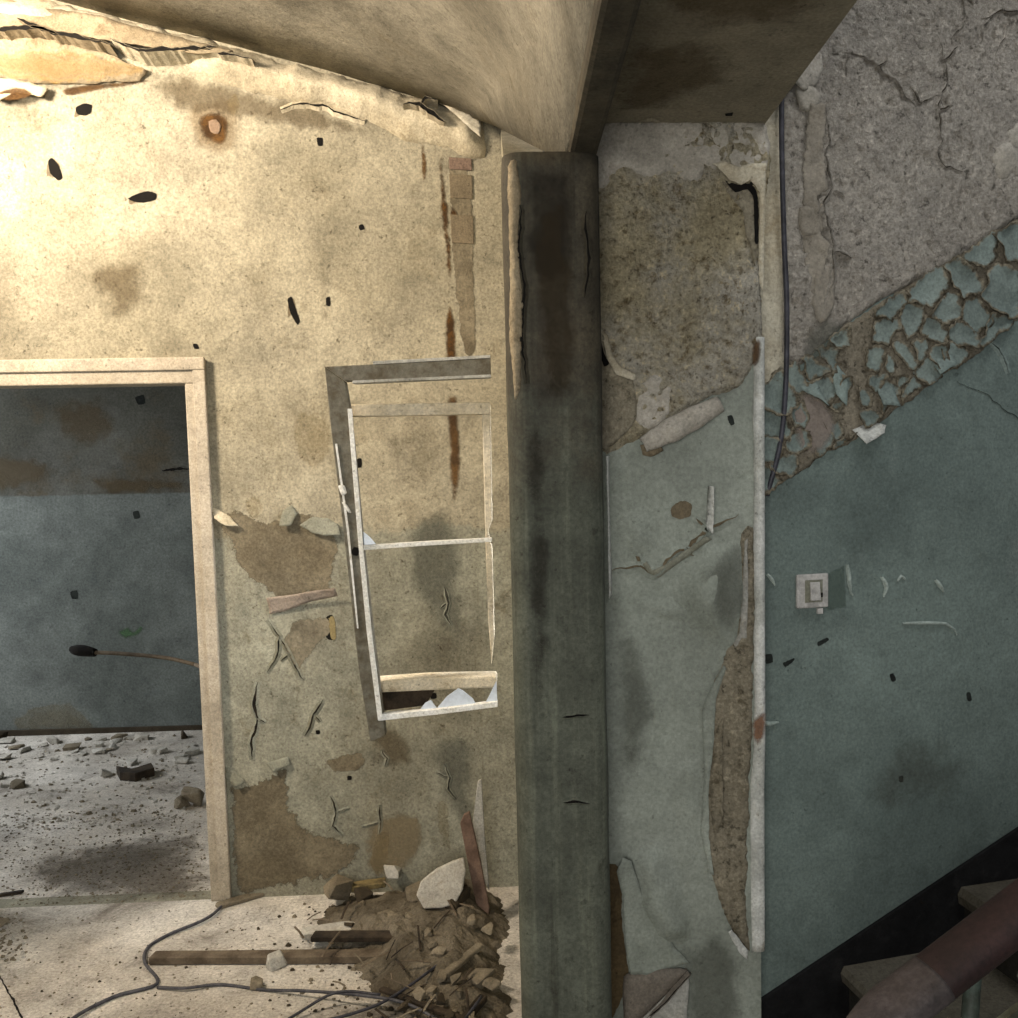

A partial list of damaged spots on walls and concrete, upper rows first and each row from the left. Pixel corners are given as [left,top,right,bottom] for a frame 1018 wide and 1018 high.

corrosion [200,114,227,143]
flaking render [0,0,486,356]
corrosion [440,168,456,271]
crack [834,0,1018,173]
corrosion [446,309,455,357]
flaking render [596,0,1018,599]
corrosion [448,415,460,493]
crack [957,381,1018,419]
spalling [212,505,341,614]
spalling [701,526,795,959]
spalling [225,756,420,893]
crack [0,974,25,1018]